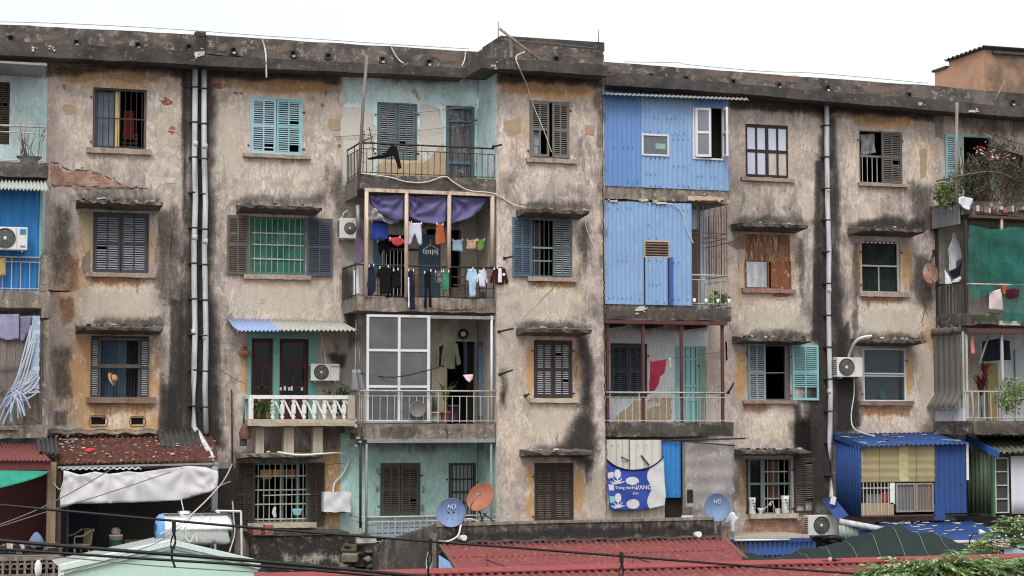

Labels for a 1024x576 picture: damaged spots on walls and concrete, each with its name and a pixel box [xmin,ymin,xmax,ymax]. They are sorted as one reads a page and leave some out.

spalling [50,161,135,191]
damp [45,63,339,447]
peeling [335,89,446,182]
damp [729,99,935,503]
damp [531,335,603,513]